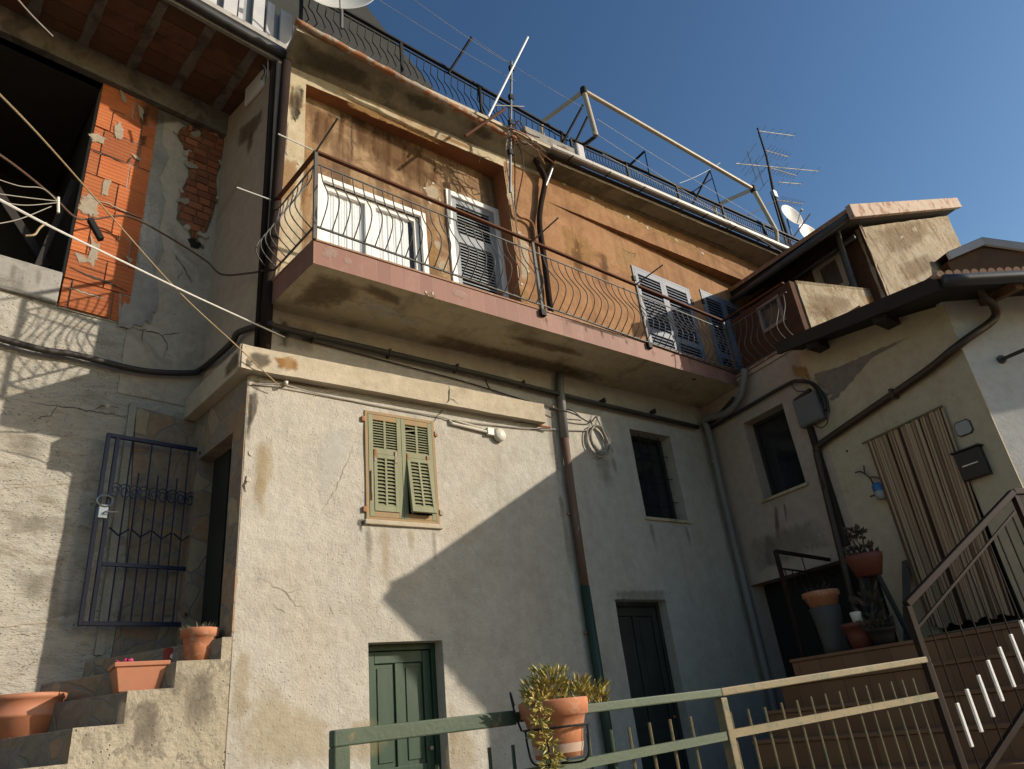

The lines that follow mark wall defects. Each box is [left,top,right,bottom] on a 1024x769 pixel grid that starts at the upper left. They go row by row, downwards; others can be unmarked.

spalling [183,224,210,249]
crack [29,401,124,419]